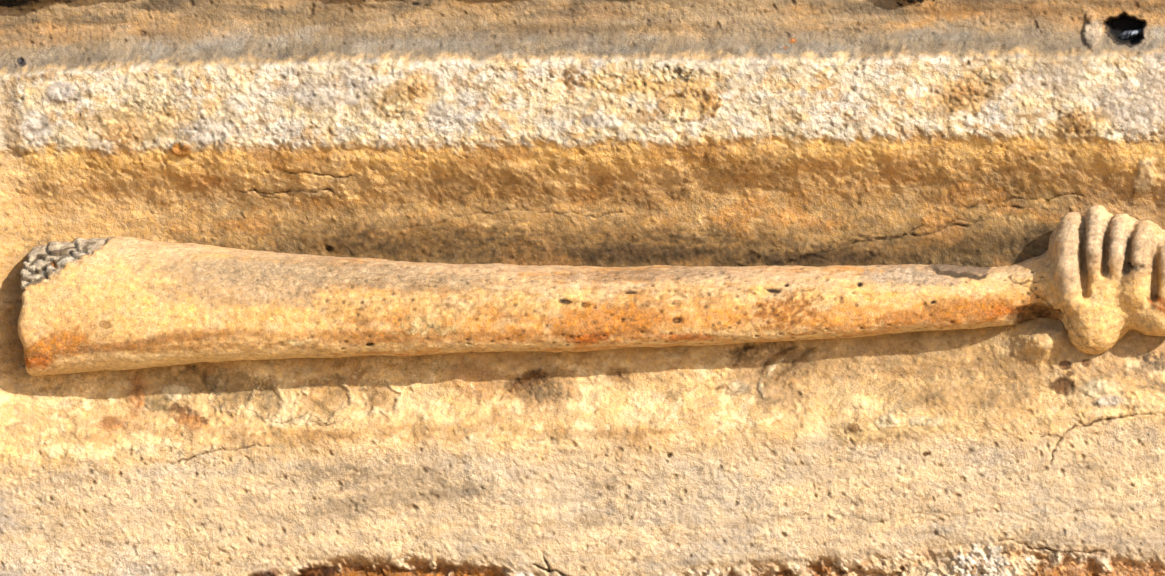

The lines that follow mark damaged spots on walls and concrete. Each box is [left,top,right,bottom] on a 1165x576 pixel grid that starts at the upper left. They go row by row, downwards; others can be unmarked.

crack [1041,413,1150,462]
spalling [304,567,335,576]